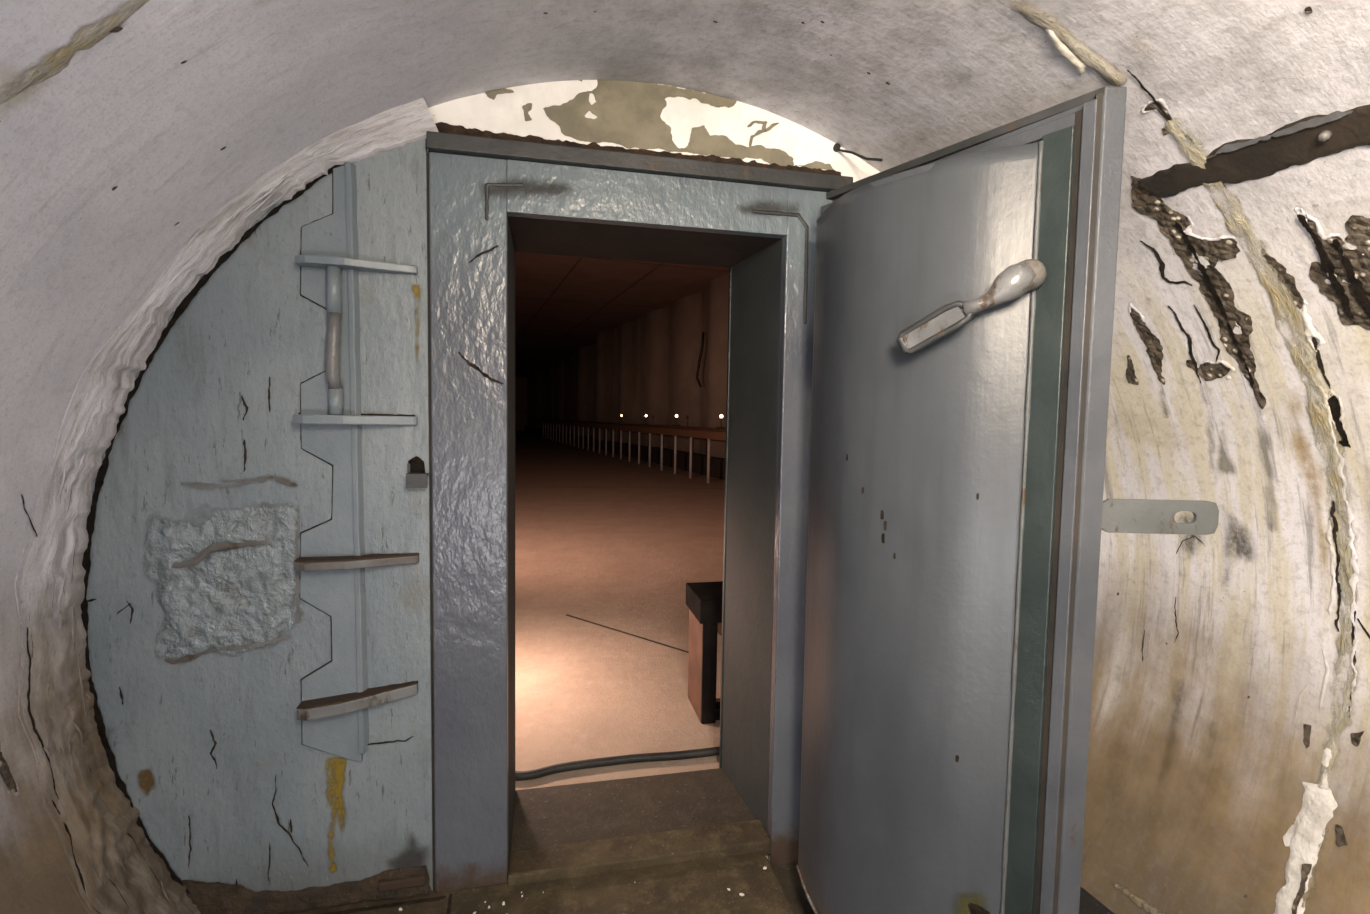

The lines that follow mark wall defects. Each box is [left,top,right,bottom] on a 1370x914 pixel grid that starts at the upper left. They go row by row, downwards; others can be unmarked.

peeling [485,80,834,170]
crack [1127,70,1197,145]
spalling [1124,303,1165,385]
crack [1140,240,1220,383]
spalling [1131,176,1266,409]
spalling [1261,207,1370,353]
crack [1312,337,1331,390]
water stain [1220,446,1234,472]
water stain [1261,434,1271,478]
spalling [1326,389,1351,448]
rust [80,164,432,914]
water stain [1228,525,1252,557]